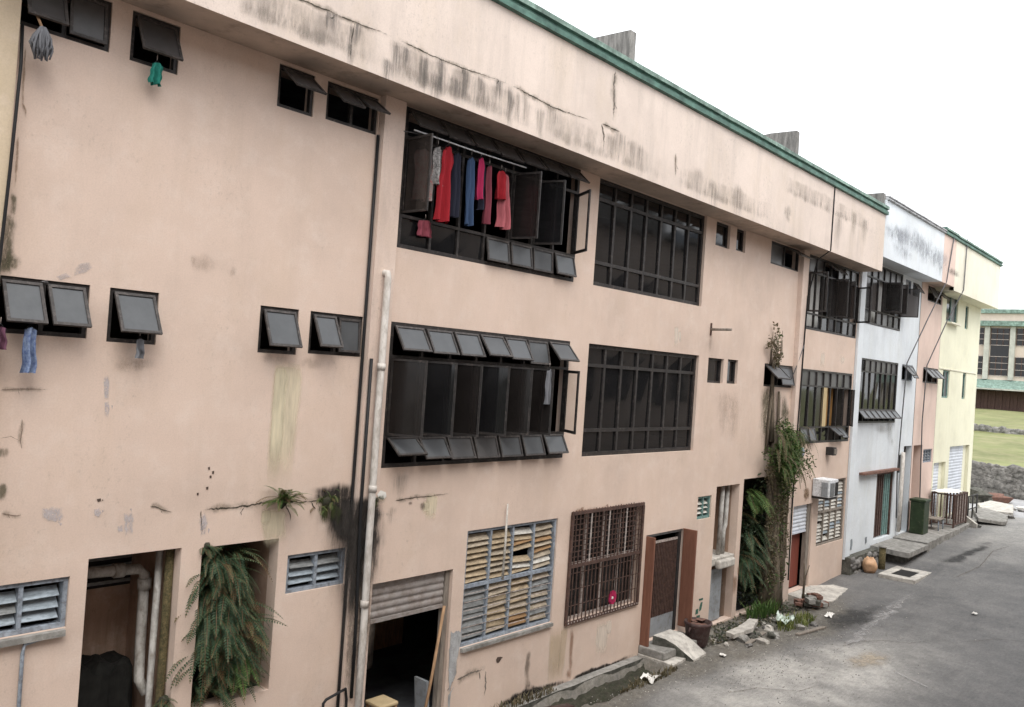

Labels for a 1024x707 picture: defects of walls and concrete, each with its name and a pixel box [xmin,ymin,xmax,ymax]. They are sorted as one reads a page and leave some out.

crack [406,43,618,137]
water stain [1,196,16,270]
crack [200,500,319,526]
water stain [317,485,381,675]